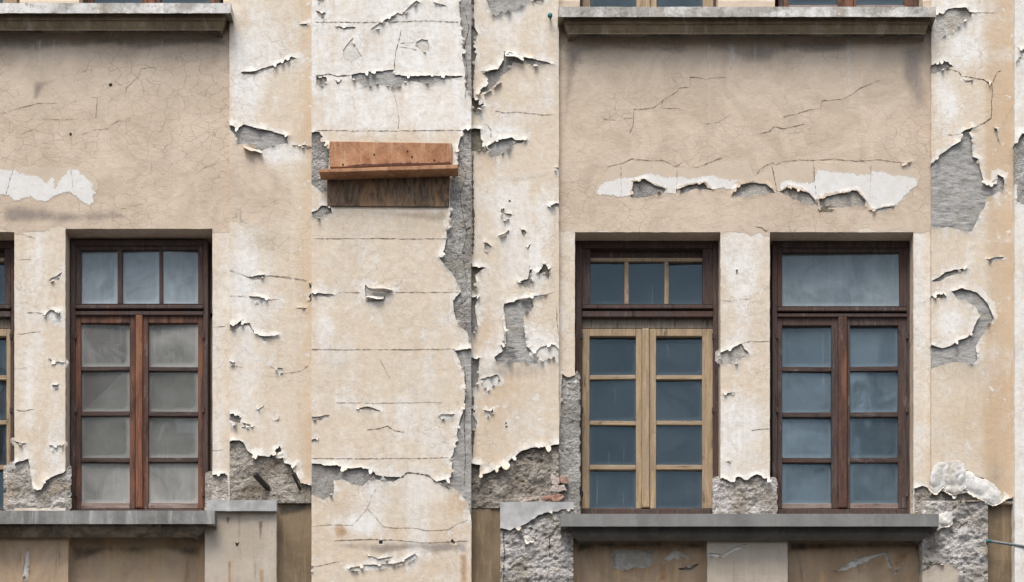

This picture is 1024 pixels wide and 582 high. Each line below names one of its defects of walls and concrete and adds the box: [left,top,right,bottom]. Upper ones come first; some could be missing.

spalling [931,7,973,38]
spalling [230,124,330,193]
crack [602,77,721,190]
peeling [595,128,1024,232]
crack [760,81,877,134]
crack [757,159,904,204]
spalling [436,128,580,582]
spalling [930,268,994,369]
spalling [3,459,72,511]
spalling [205,413,400,507]
spalling [713,474,778,514]
spalling [911,486,988,582]